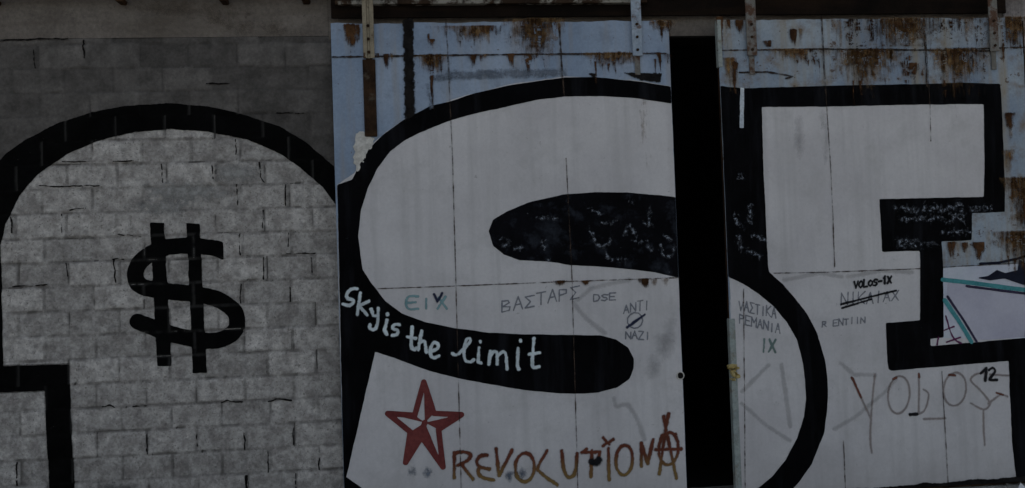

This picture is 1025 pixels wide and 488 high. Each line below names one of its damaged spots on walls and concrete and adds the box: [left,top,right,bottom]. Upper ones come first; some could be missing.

corrosion [343,23,360,46]
corrosion [419,34,443,97]
corrosion [447,18,563,72]
corrosion [581,51,634,82]
corrosion [650,20,672,72]
corrosion [723,57,738,93]
corrosion [763,16,1025,102]
corrosion [947,177,1025,276]